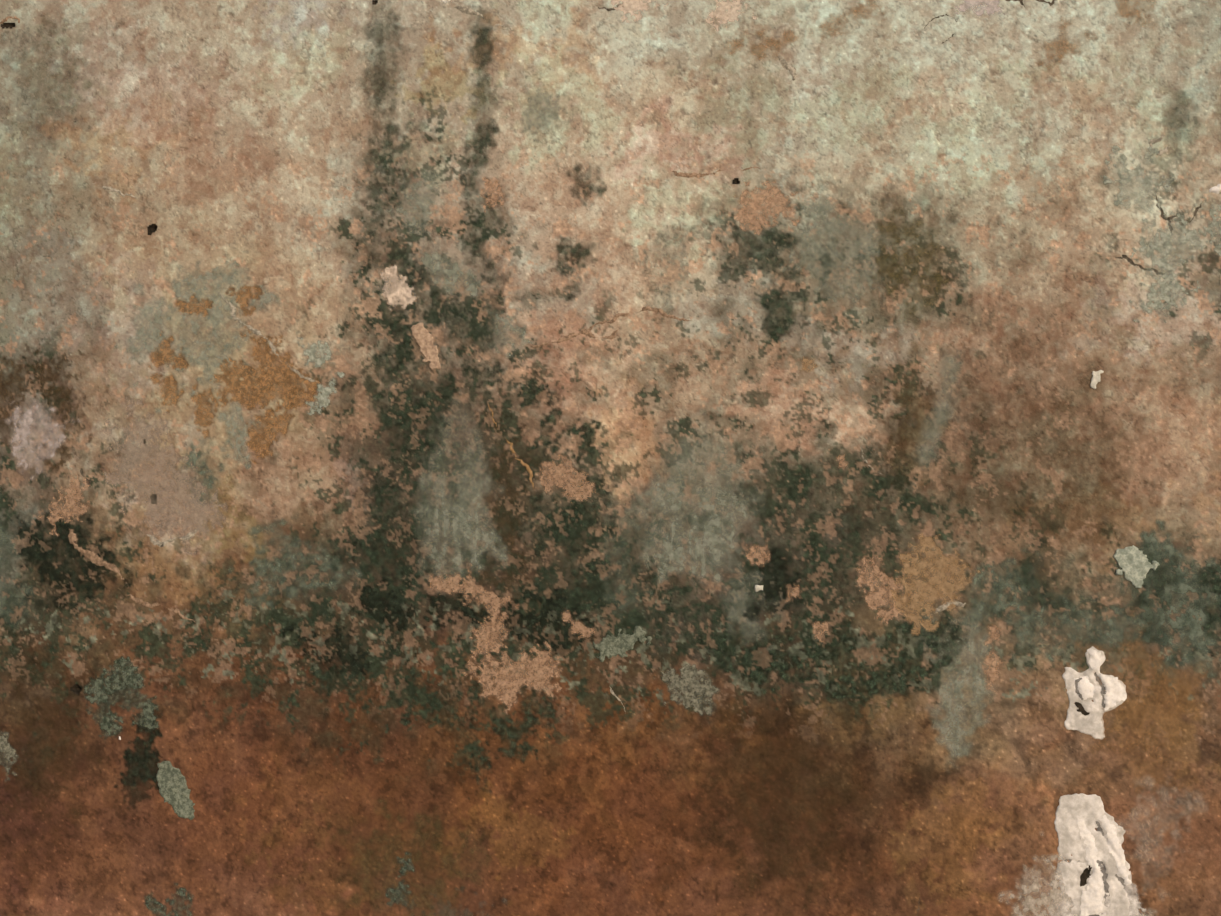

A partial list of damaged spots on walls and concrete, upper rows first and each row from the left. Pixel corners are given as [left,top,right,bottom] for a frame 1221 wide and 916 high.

crack [1006,0,1055,8]
spalling [226,286,262,315]
damp [363,125,531,462]
damp [557,238,590,298]
damp [731,201,949,341]
spalling [150,331,344,463]
damp [518,379,561,456]
damp [17,501,132,609]
damp [352,419,618,725]
damp [637,474,761,586]
damp [744,548,803,620]
damp [701,608,991,756]